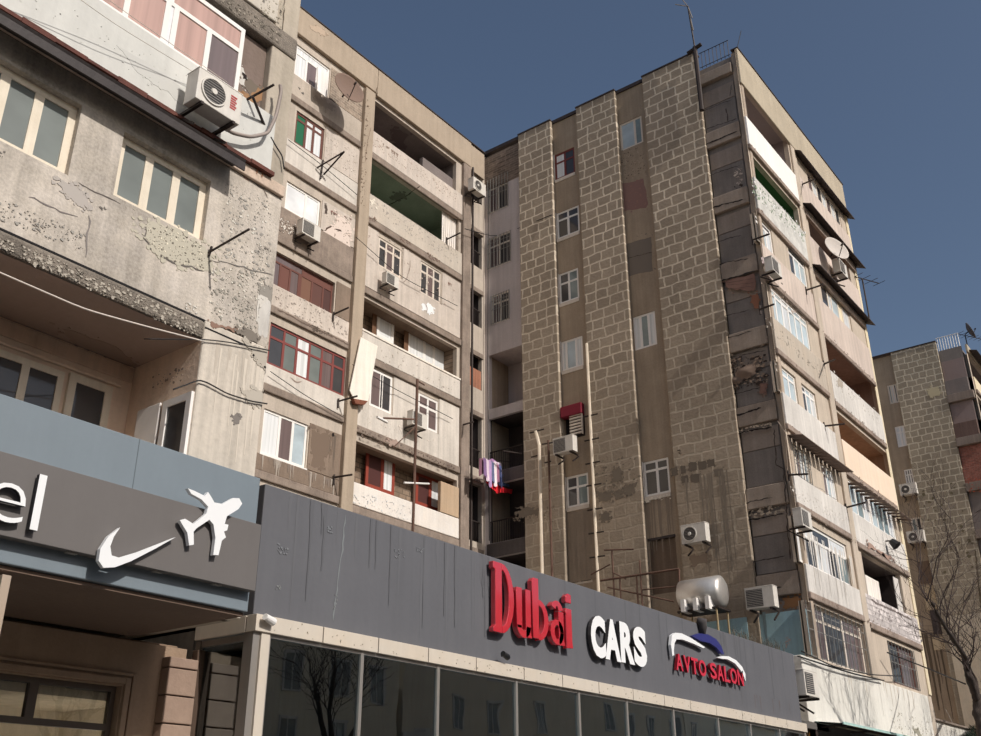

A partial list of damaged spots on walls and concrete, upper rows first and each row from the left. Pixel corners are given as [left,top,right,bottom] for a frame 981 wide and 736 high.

peeling [0,238,203,337]
peeling [131,186,297,331]
spalling [729,336,769,390]